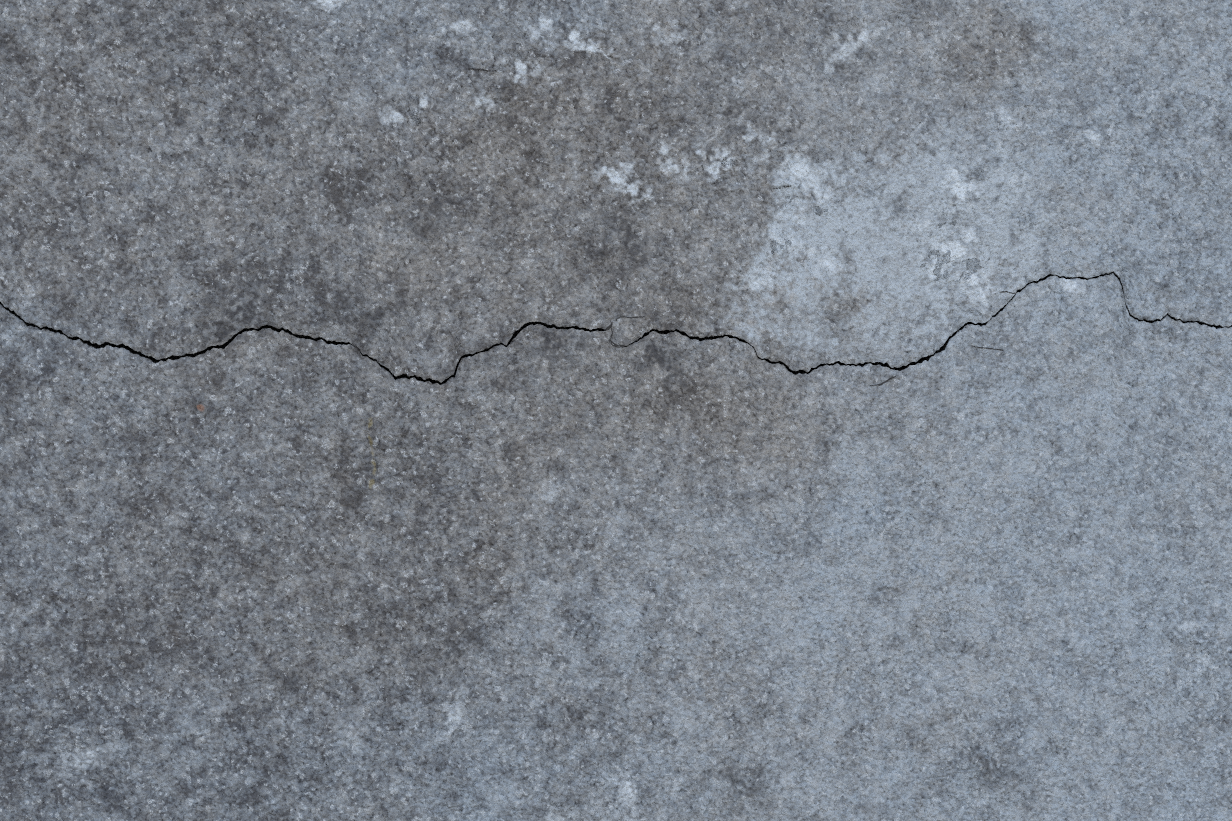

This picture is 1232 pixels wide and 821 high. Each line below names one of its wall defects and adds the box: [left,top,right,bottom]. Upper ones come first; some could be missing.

crack [0,272,1232,386]